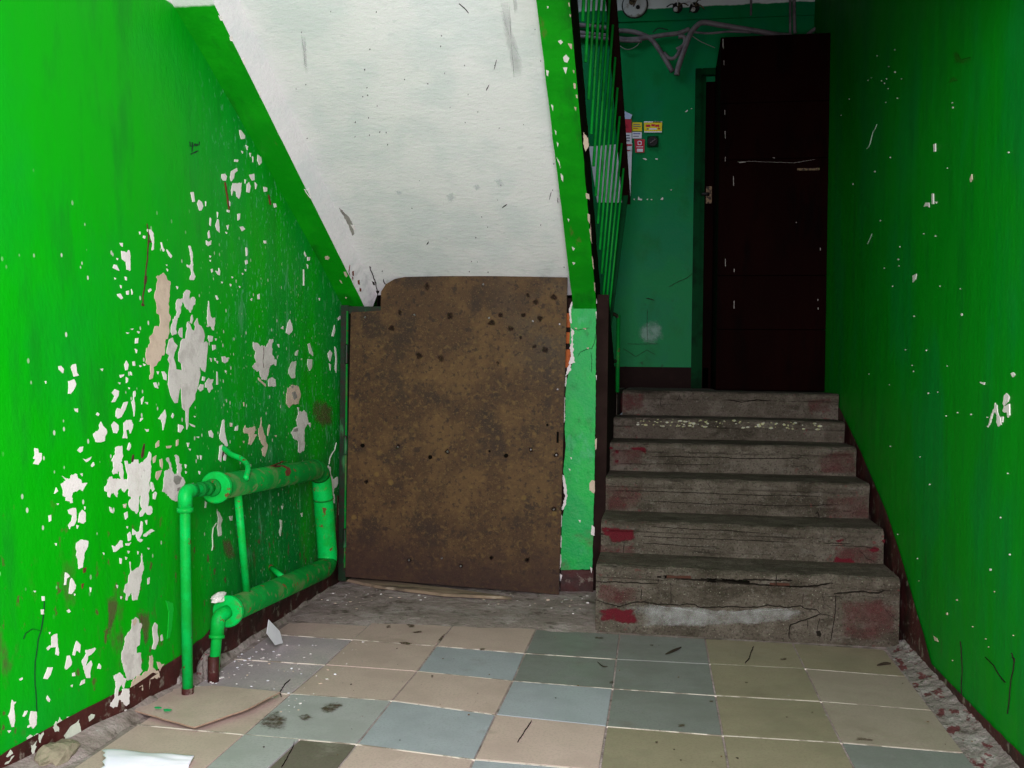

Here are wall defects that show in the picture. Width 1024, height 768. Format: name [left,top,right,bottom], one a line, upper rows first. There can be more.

peeling [190,130,267,288]
peeling [33,448,42,465]
peeling [58,364,79,394]
peeling [93,229,277,600]
peeling [252,339,313,453]
spalling [564,302,575,422]
peeling [986,393,1010,427]
peeling [48,446,95,596]
crack [597,574,896,639]
peeling [43,632,101,687]
peeling [110,617,164,711]
peeling [7,700,95,754]